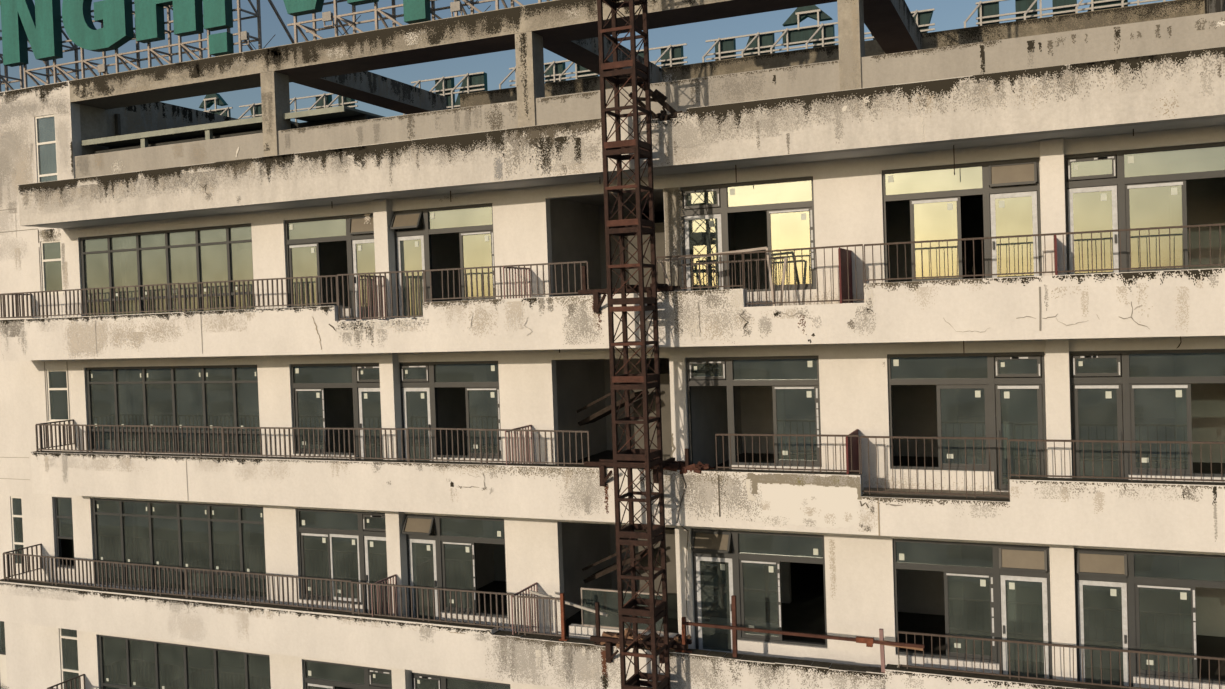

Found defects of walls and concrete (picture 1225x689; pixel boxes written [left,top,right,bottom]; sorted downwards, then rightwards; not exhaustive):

damp [575,0,1225,164]
damp [0,0,724,260]
damp [658,189,821,344]
damp [0,299,504,359]
damp [521,297,604,345]
damp [847,269,1222,336]
crack [1019,301,1147,327]
damp [31,452,496,494]
damp [556,469,621,518]
spalling [664,470,862,501]
damp [0,583,628,689]